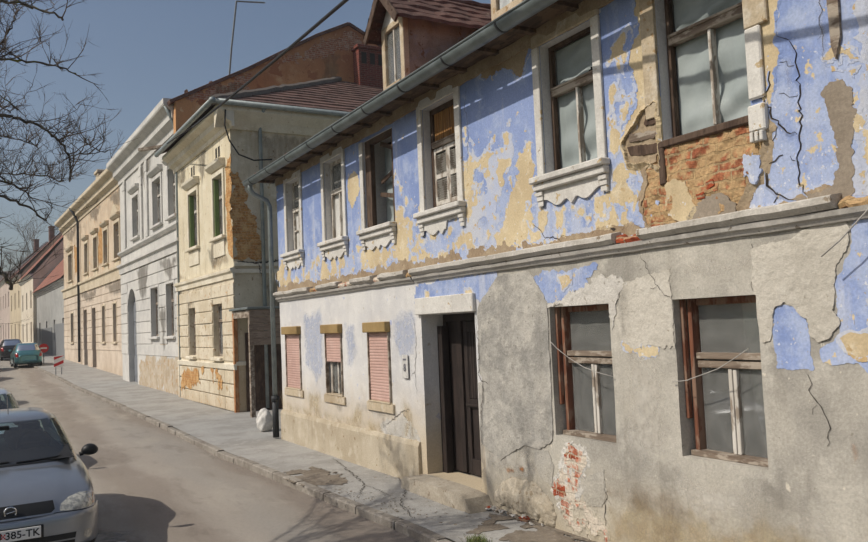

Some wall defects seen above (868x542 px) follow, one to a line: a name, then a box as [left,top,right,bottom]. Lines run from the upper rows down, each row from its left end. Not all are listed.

peeling [820,42,862,79]
spalling [275,0,834,292]
crack [759,36,808,203]
peeling [853,107,868,190]
spalling [225,154,262,261]
peeling [820,219,868,373]
crack [808,376,831,446]
spalling [550,441,611,542]